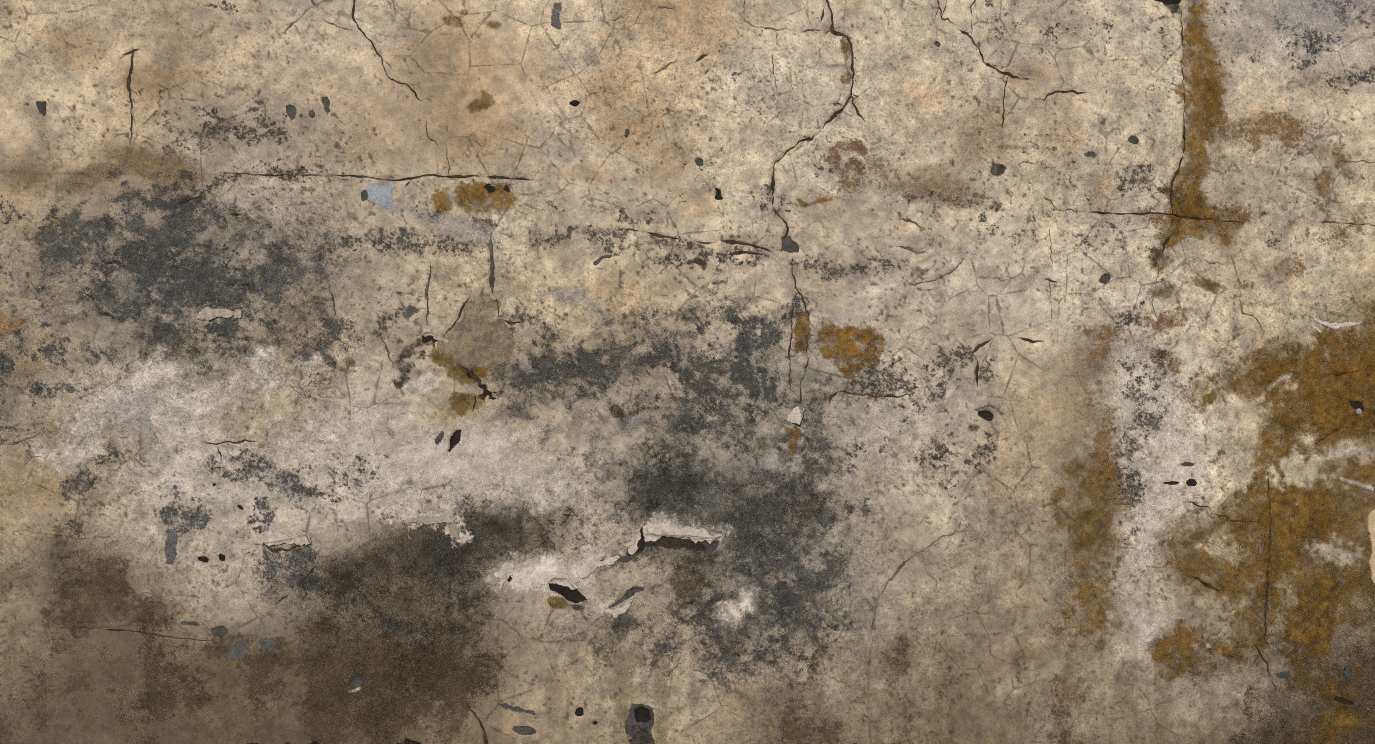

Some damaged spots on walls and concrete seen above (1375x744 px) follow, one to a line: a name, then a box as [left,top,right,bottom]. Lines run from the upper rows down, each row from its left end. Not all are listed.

damp [0,86,498,537]
crack [180,0,535,203]
corrosion [431,179,516,233]
crack [622,0,913,426]
damp [750,184,794,228]
corrosion [793,312,885,380]
crack [972,9,1243,386]
corrosion [1137,0,1375,678]
damp [40,195,1007,744]
peeling [494,523,722,610]
peeling [605,587,644,618]
corrosion [1044,404,1131,650]